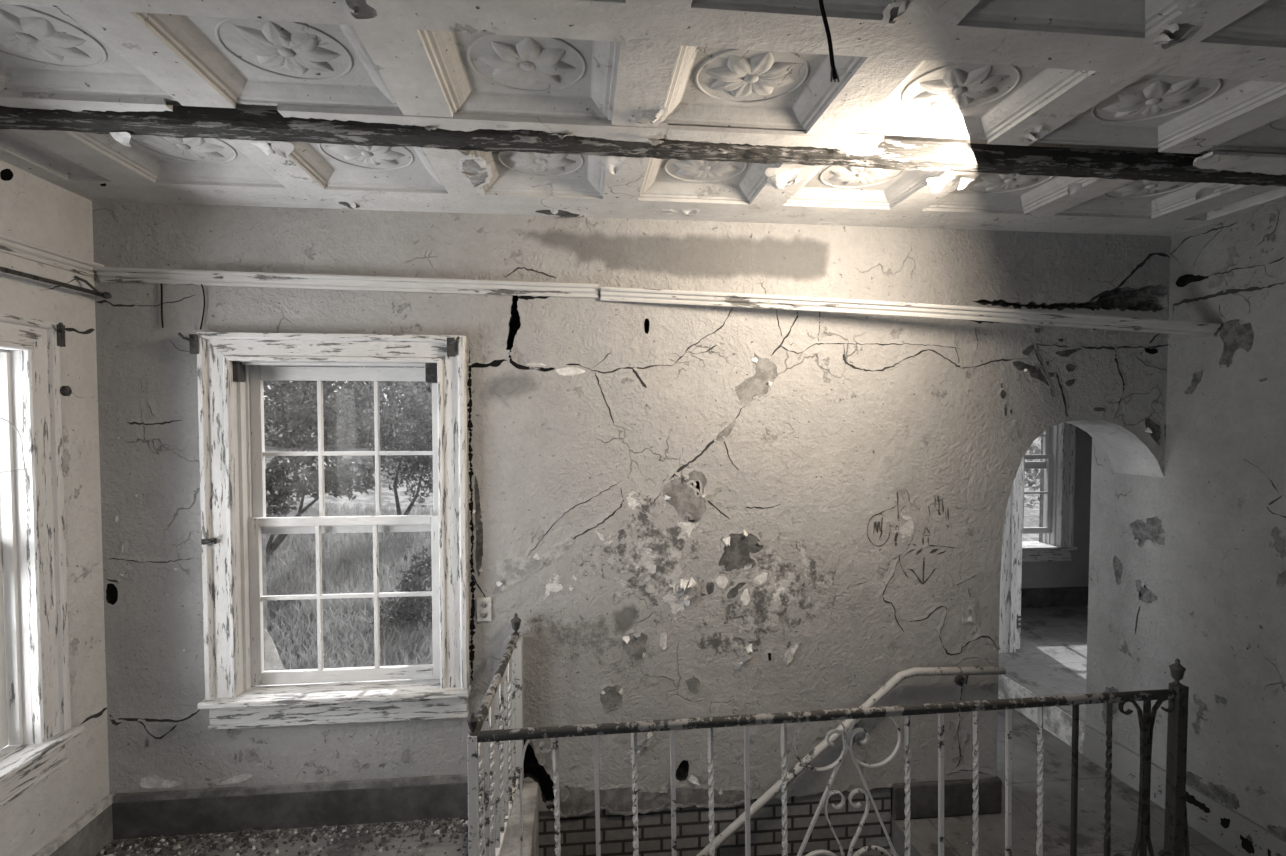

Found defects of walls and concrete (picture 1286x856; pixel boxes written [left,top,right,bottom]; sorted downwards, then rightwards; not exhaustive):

peeling [339,0,385,22]
crack [0,91,1286,421]
flaking render [714,348,781,444]
peeling [1181,315,1259,398]
crack [467,263,733,680]
crack [525,403,781,556]
peeling [1128,514,1168,551]
crack [1243,455,1286,518]
peeling [471,467,838,713]
crack [879,554,1000,776]
crack [78,703,200,739]
peeling [1186,768,1286,856]